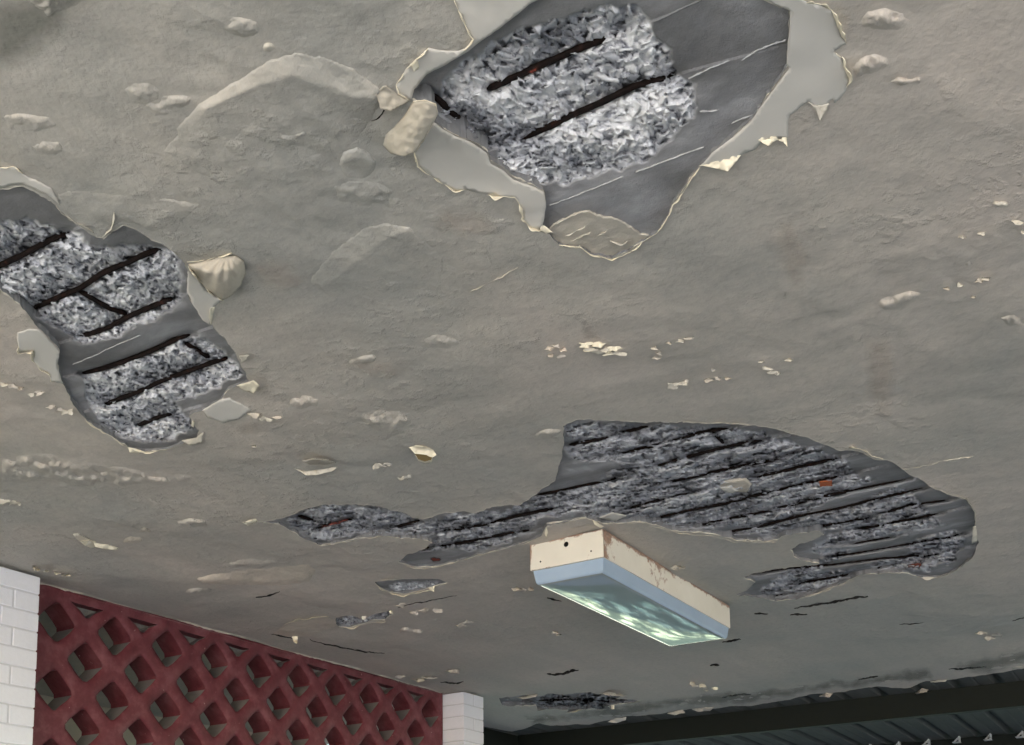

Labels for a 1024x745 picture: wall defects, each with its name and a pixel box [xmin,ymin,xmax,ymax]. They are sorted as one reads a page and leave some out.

spalling [376,0,853,261]
spalling [0,166,282,454]
peeling [357,411,411,436]
spalling [243,419,979,643]
crack [754,596,868,616]
crack [272,634,374,653]
spalling [499,692,638,723]
spalling [667,707,713,715]